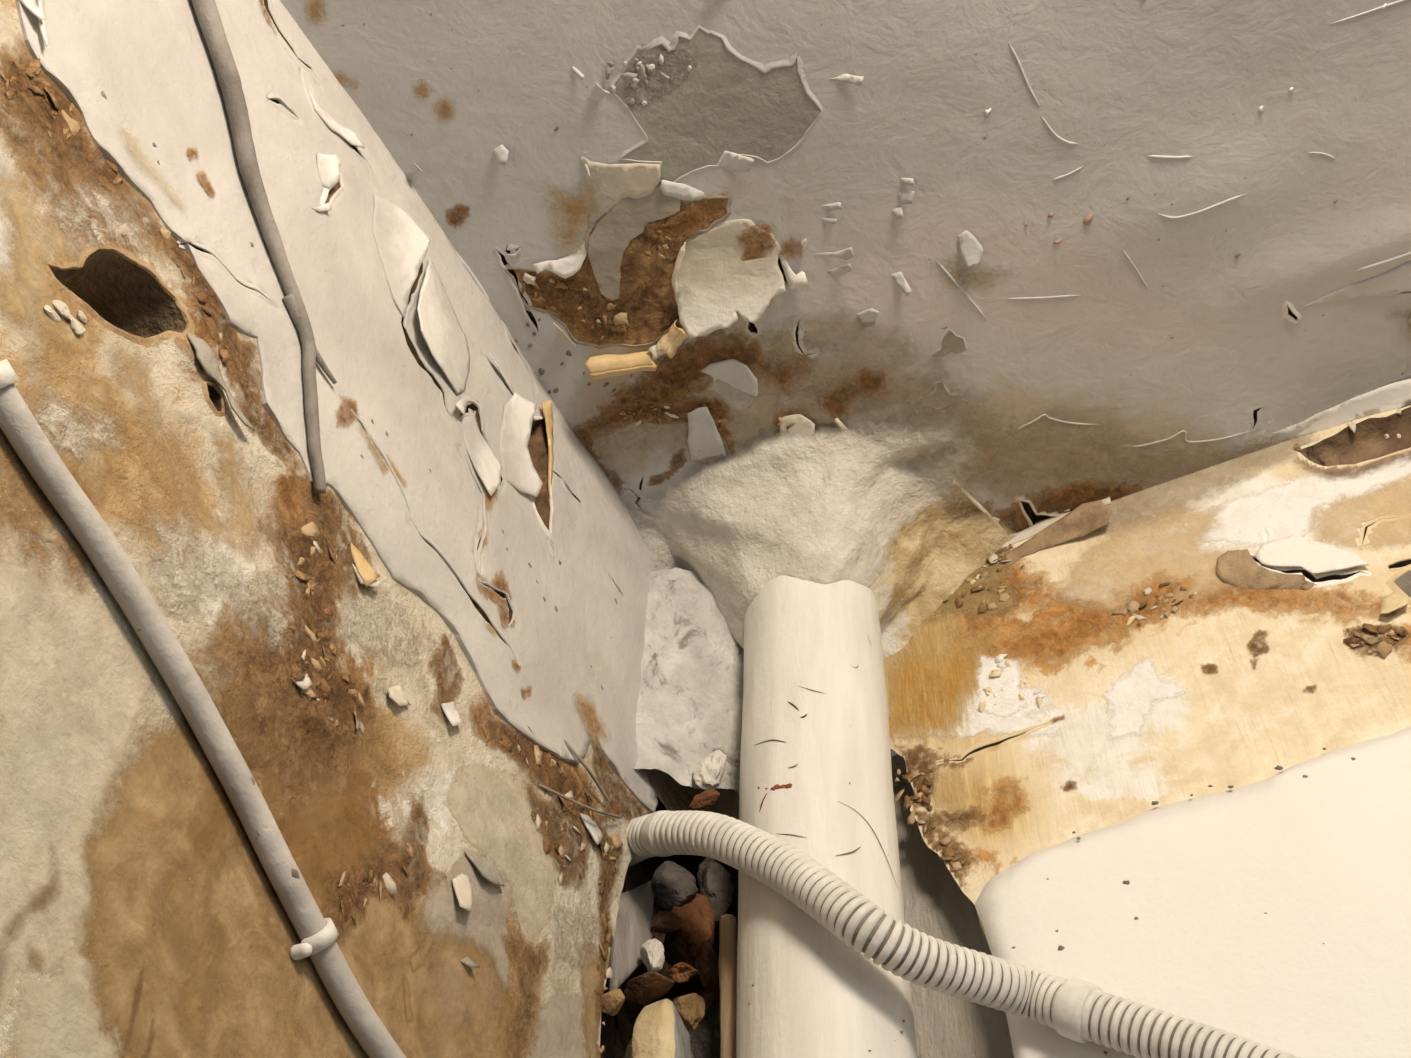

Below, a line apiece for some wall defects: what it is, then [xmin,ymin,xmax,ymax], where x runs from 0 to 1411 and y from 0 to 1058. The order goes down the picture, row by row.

water stain [0,43,181,349]
peeling [504,26,824,350]
water stain [36,381,119,490]
peeling [372,194,554,499]
flaking render [604,359,758,465]
crack [1391,291,1411,302]
water stain [148,440,513,1058]
water stain [884,603,981,740]
flaking render [975,654,1044,717]
peeling [1216,535,1369,590]
flaking render [1343,567,1411,659]
water stain [85,728,369,1058]